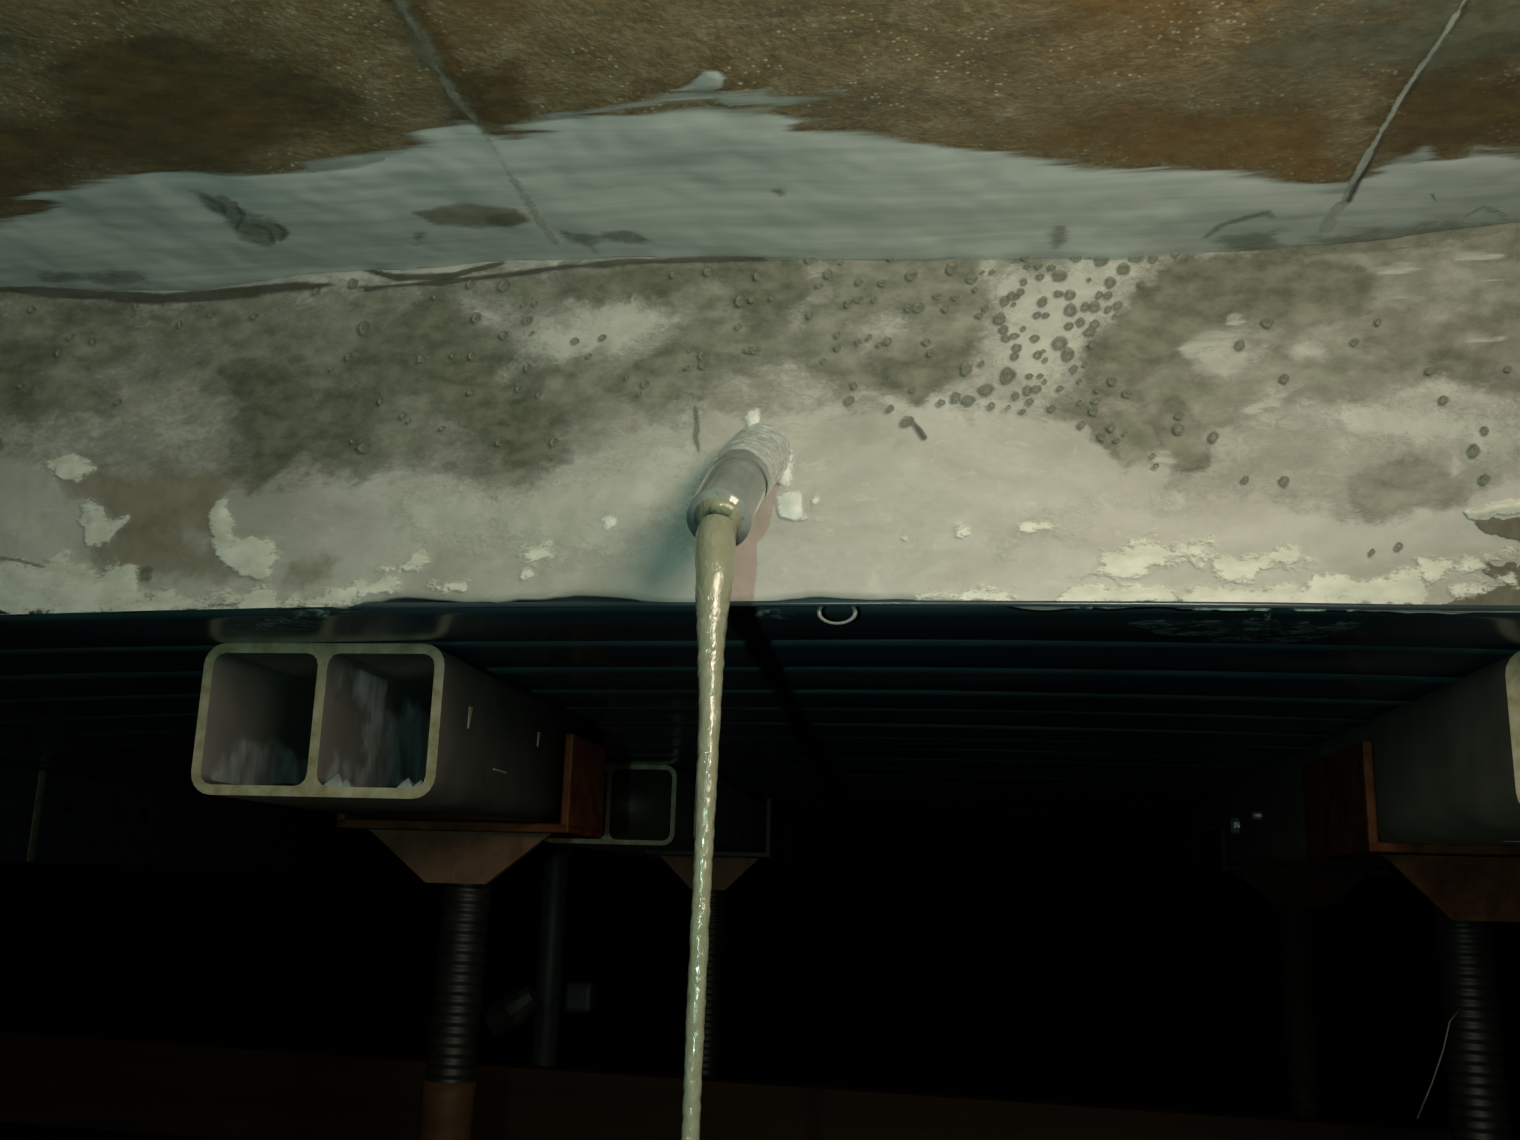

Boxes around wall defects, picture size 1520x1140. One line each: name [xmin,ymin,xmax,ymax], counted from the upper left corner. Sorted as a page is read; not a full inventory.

leakage [304,153,402,171]
corrosion [449,66,531,129]
leakage [546,90,811,118]
crack [1271,0,1520,255]
spalling [905,253,1180,442]
leakage [1051,227,1520,471]
leakage [0,256,1051,571]
peeling [77,498,130,547]
peeling [208,496,281,588]
peeling [1055,542,1520,613]
leakage [1351,460,1466,519]
spalling [1464,498,1520,541]